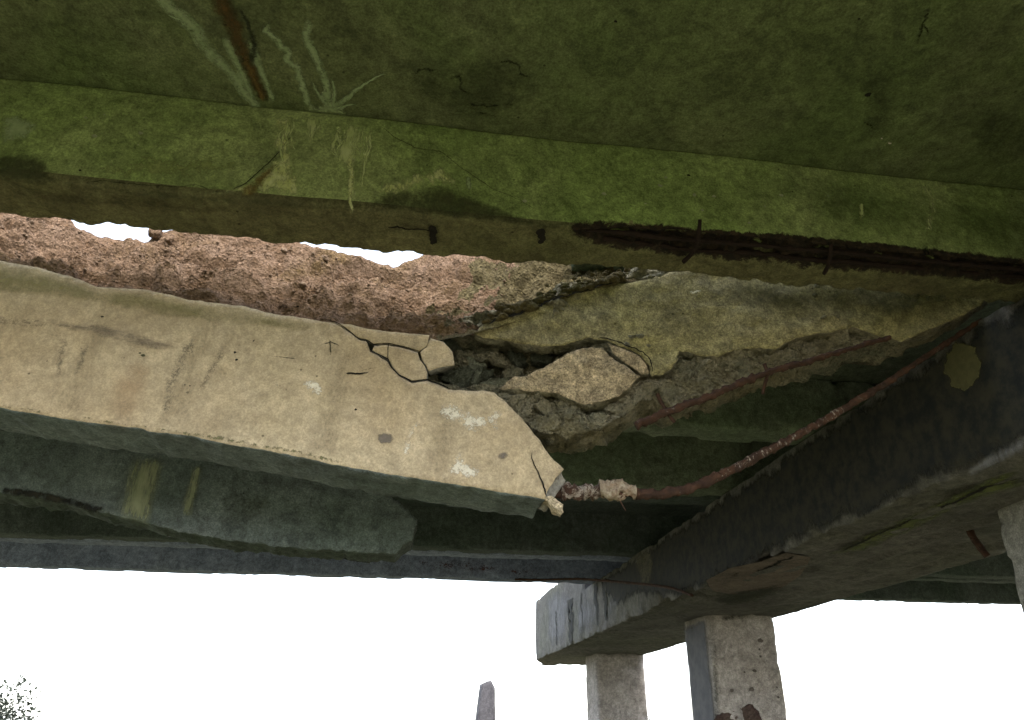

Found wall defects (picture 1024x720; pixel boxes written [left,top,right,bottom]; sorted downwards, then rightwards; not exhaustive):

leakage [157,0,275,107]
corrosion [214,0,267,100]
leakage [213,21,384,209]
leakage [0,156,49,184]
crack [328,320,460,388]
peeling [371,338,496,391]
crack [600,337,653,372]
peeling [440,405,499,432]
spalling [554,318,982,511]
leakage [122,461,158,520]
peeling [451,453,478,477]
crack [531,455,547,496]